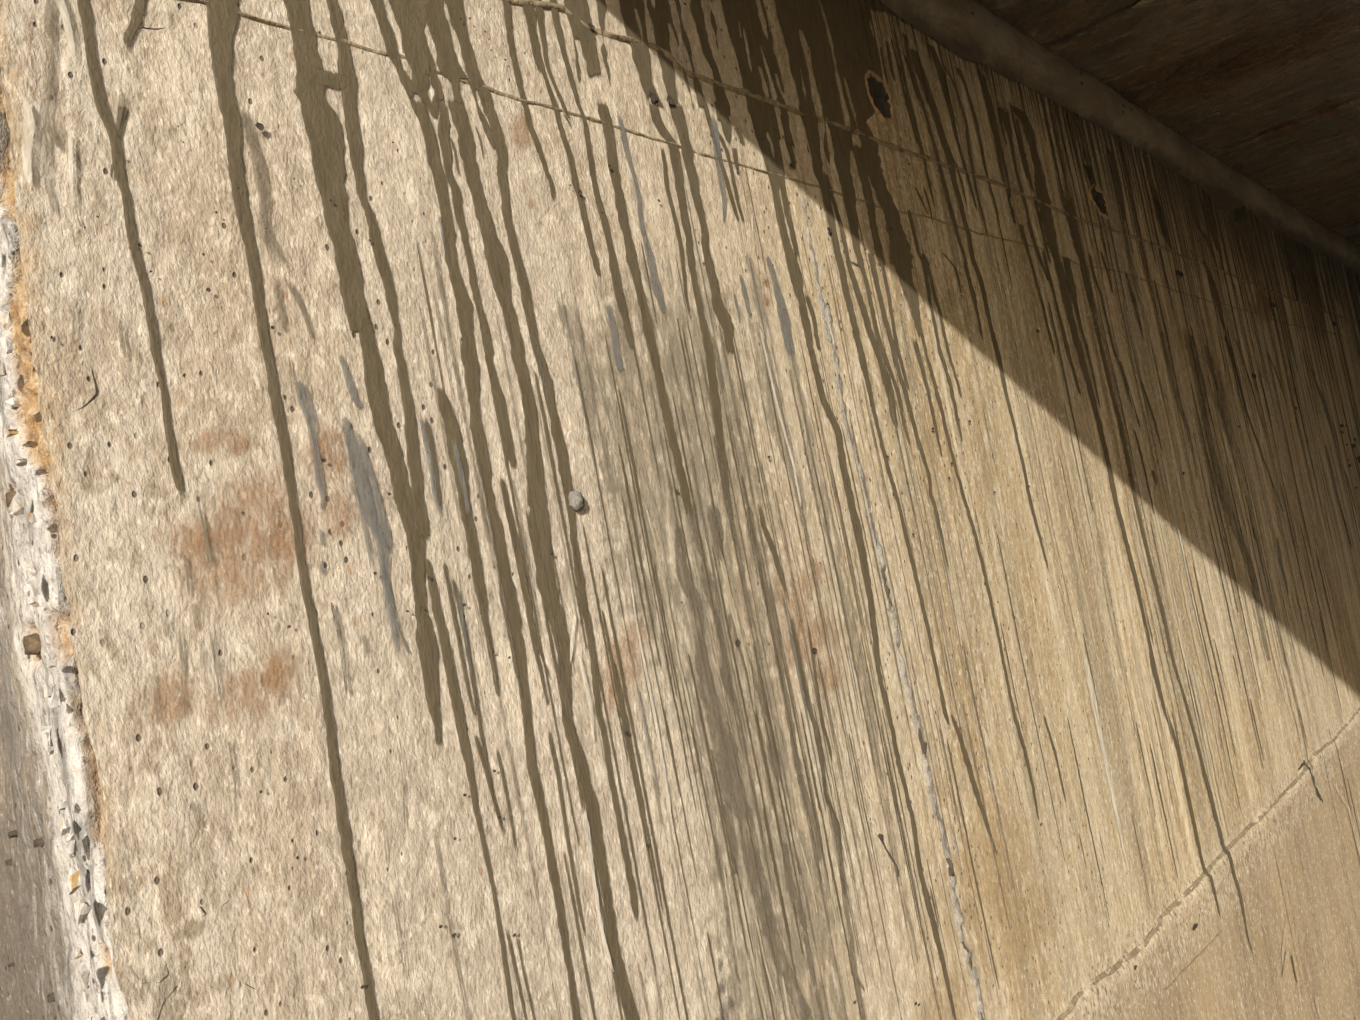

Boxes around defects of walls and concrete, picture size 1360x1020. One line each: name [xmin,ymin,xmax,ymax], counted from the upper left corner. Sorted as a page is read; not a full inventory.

leakage [21,0,213,563]
leakage [160,557,198,678]
leakage [205,0,378,1020]
leakage [283,0,1360,1020]
crack [1006,188,1016,223]